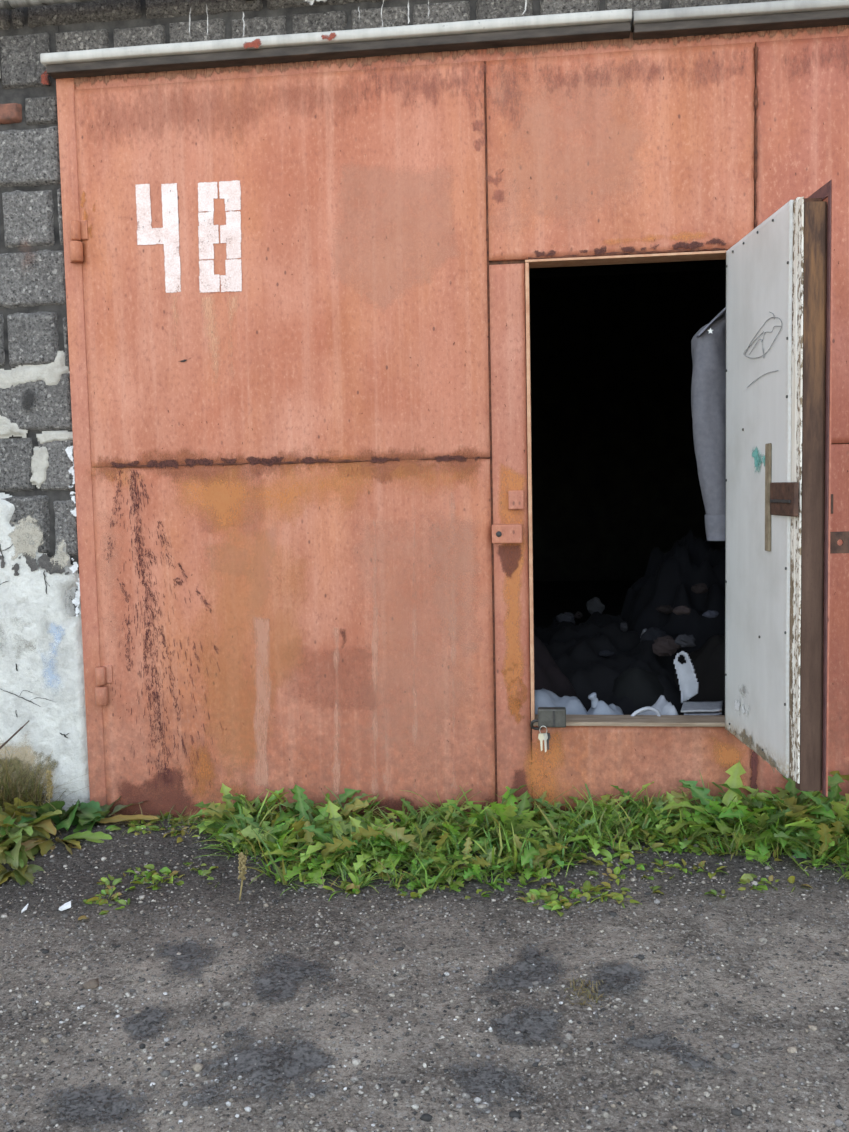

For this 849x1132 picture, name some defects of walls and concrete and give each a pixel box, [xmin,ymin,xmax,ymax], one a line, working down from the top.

corrosion [621,238,726,252]
peeling [65,446,76,517]
peeling [0,516,81,617]
corrosion [99,450,479,788]